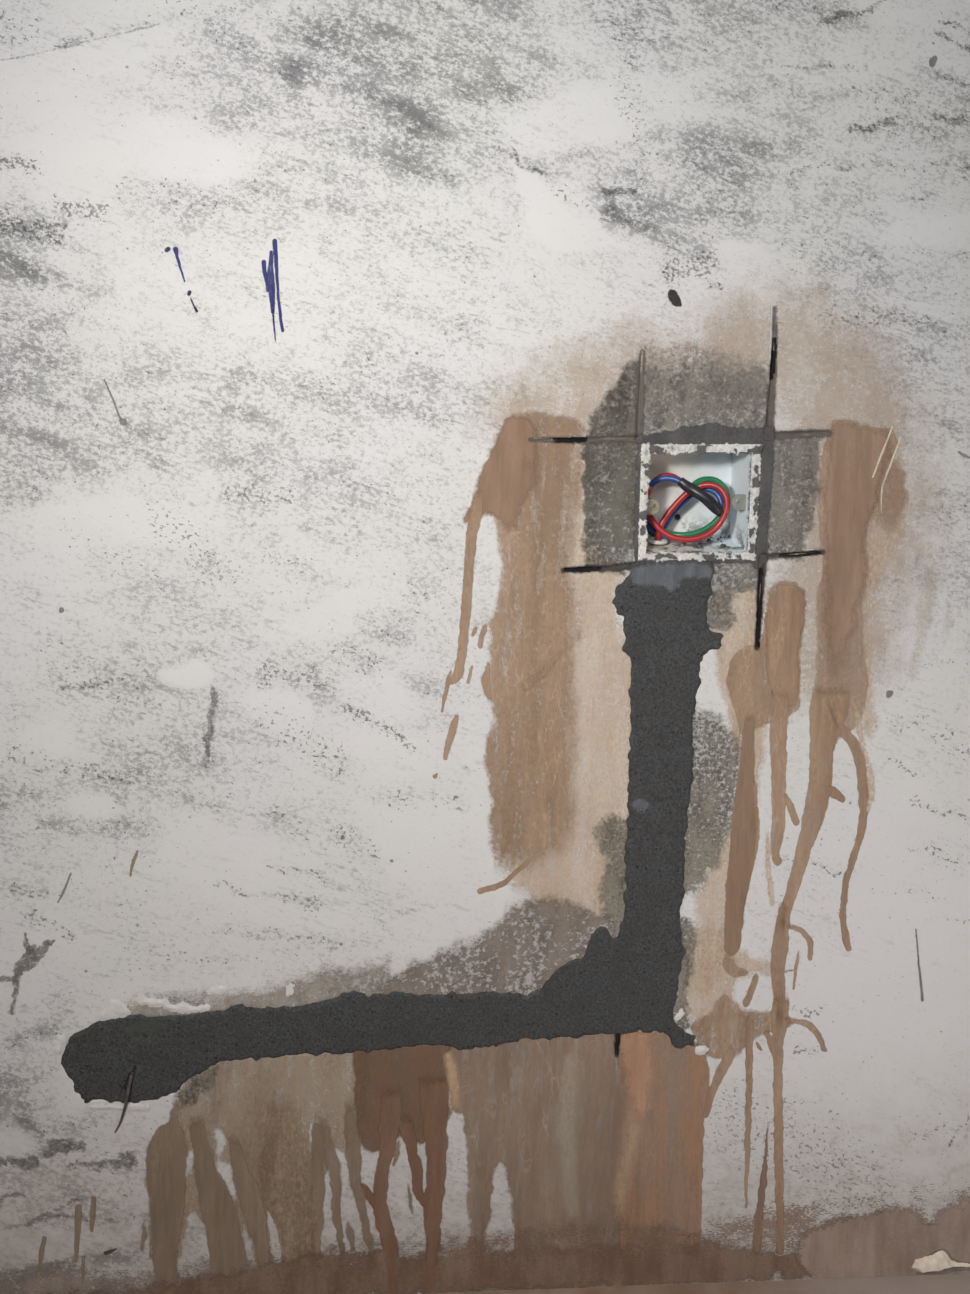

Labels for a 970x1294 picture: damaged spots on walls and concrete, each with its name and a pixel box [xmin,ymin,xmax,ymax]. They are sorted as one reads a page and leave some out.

damp [140,1052,360,1288]
damp [433,306,926,1261]